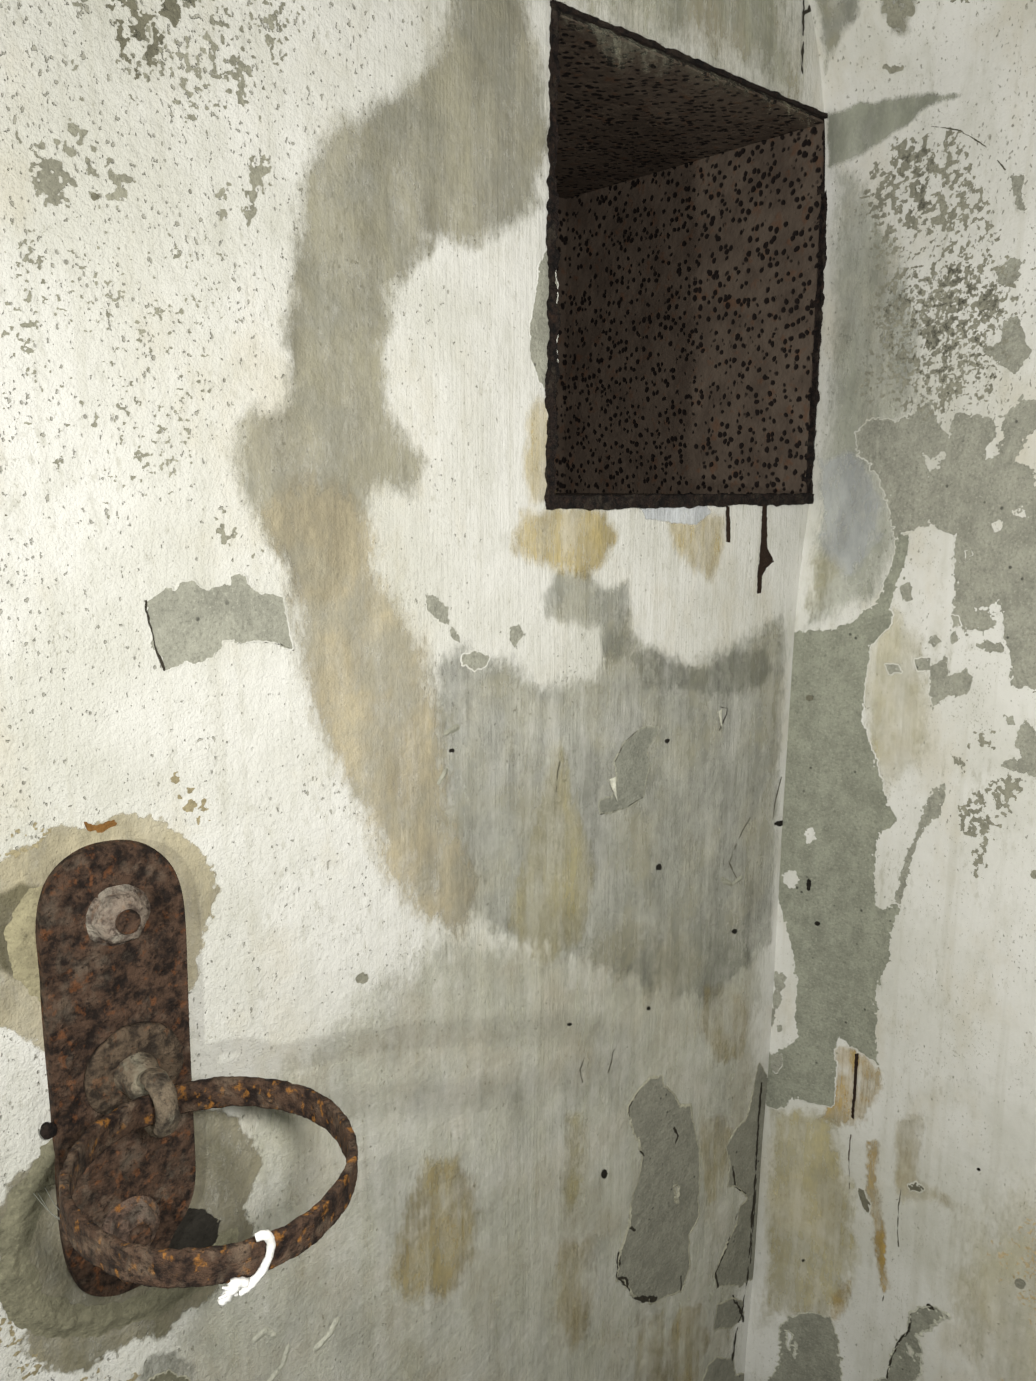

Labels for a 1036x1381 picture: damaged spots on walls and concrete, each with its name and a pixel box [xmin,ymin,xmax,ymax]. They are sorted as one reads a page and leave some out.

peeling [106,0,305,136]
crack [801,0,811,74]
leakage [819,0,857,51]
leakage [243,0,548,581]
peeling [145,549,295,672]
leakage [435,573,782,1000]
peeling [713,128,1036,1332]
leakage [0,884,29,974]
corrosion [28,1176,155,1306]
corrosion [189,1110,262,1242]
spalling [615,1075,701,1305]
corrosion [20,1285,217,1373]